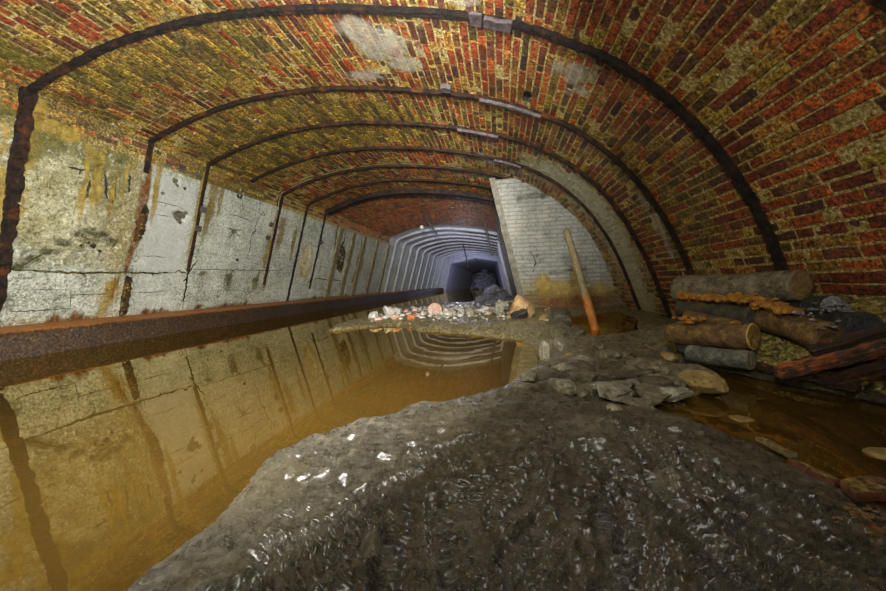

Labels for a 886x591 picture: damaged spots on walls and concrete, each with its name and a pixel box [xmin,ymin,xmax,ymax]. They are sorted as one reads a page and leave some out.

corrosion [24,99,48,169]
leakage [34,115,138,216]
crack [10,197,284,312]